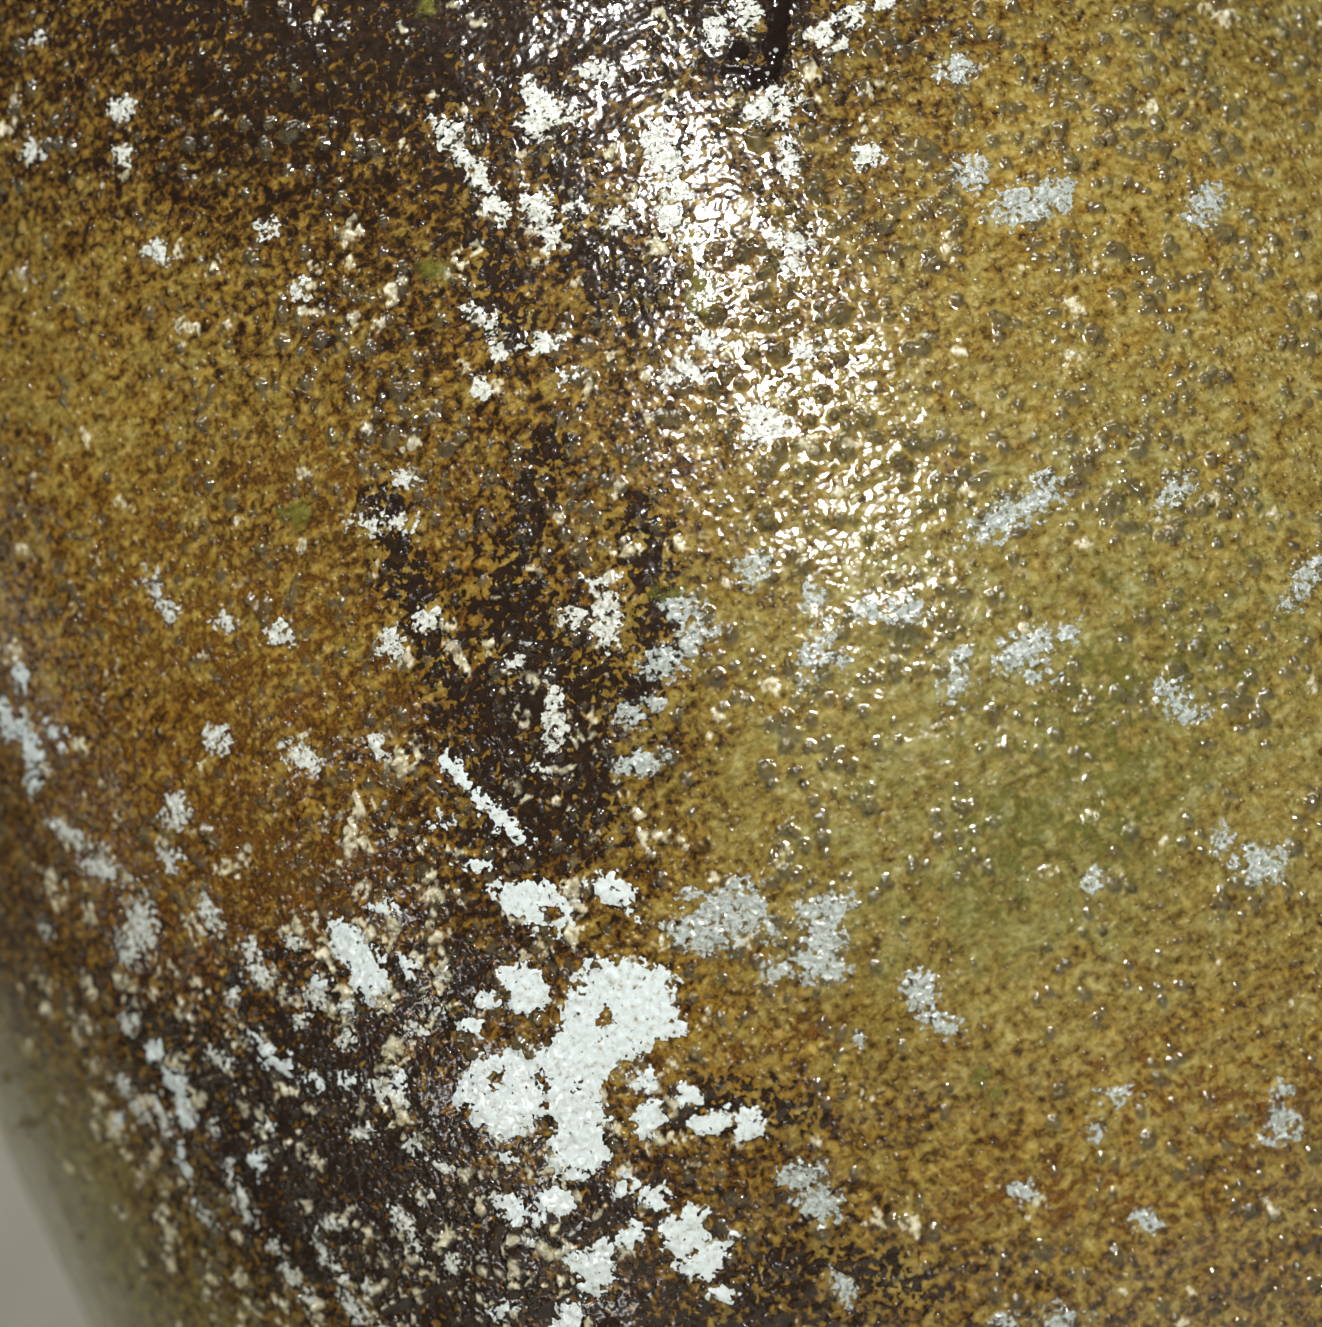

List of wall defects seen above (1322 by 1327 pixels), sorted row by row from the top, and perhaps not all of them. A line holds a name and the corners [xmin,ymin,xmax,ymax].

leakage [50,0,902,379]
leakage [353,411,695,915]
leakage [920,623,1213,927]
leakage [106,934,957,1327]